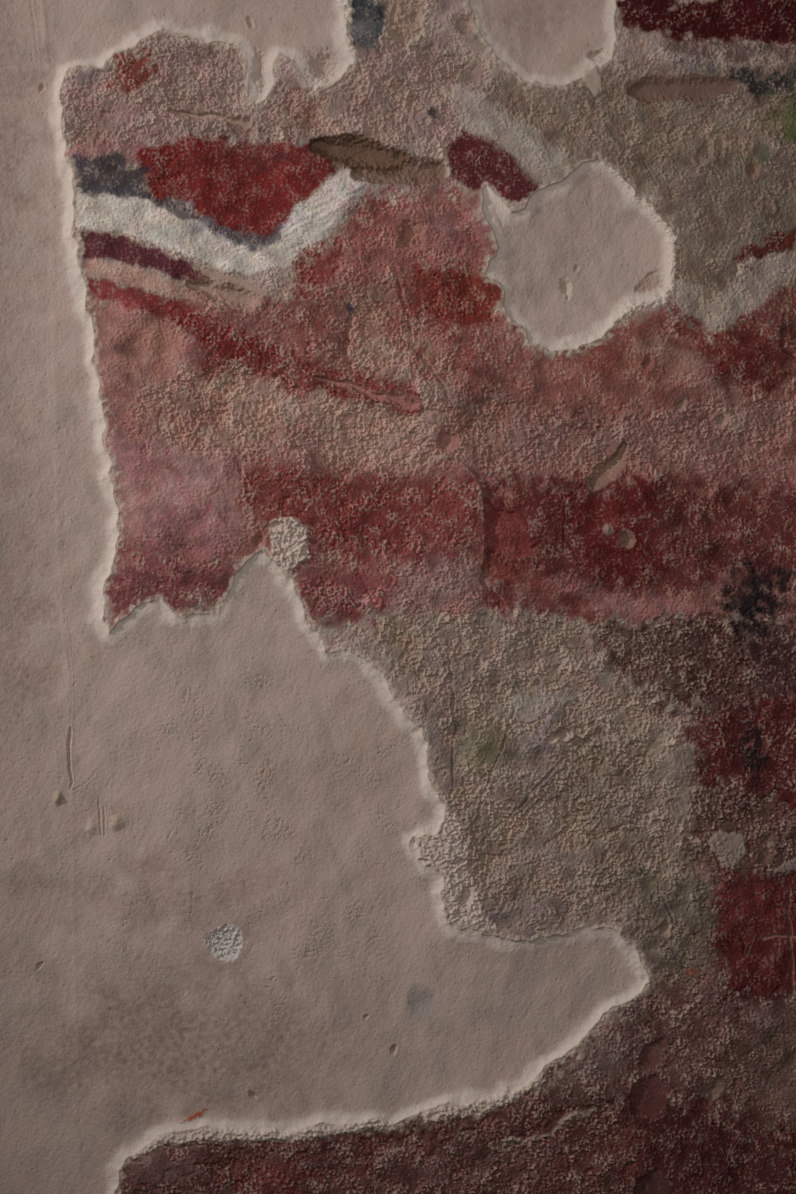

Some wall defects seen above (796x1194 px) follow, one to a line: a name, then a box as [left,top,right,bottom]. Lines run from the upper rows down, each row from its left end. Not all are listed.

spalling [67,0,482,190]
spalling [622,71,740,106]
spalling [184,267,267,315]
spalling [579,166,682,347]
spalling [143,318,443,476]
spalling [261,515,312,576]
spalling [590,608,747,723]
spalling [409,804,505,935]
spalling [682,788,796,877]
peeling [201,920,246,964]
spalling [126,1116,398,1161]
spalling [421,1071,672,1194]